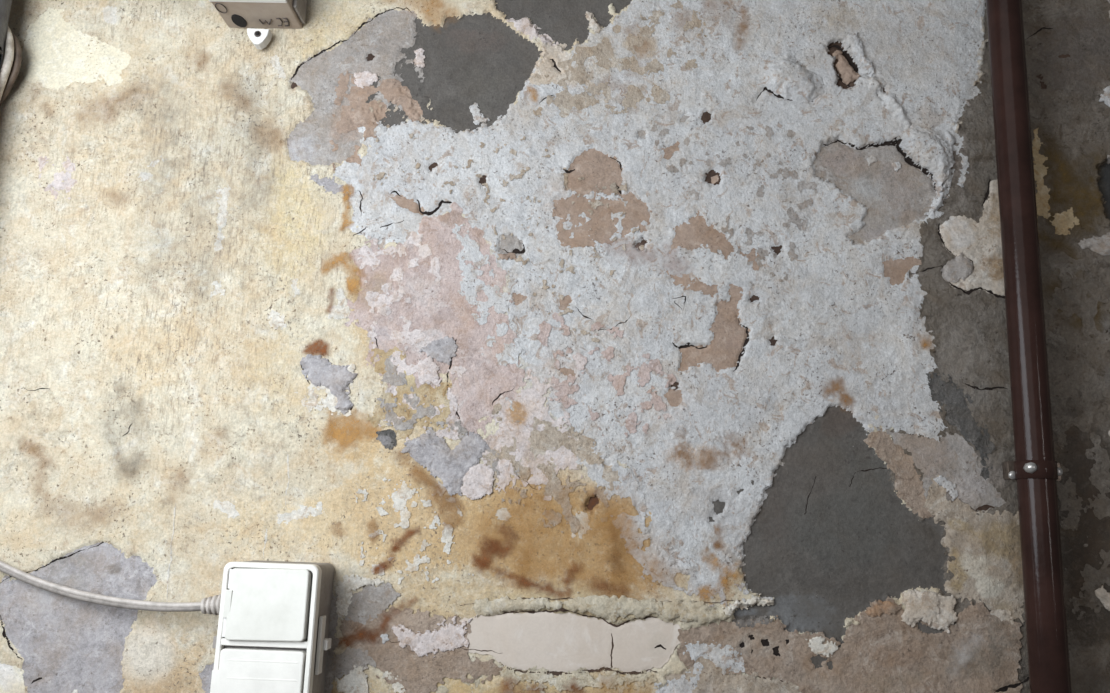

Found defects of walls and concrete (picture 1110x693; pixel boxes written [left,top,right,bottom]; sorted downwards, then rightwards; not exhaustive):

crack [823,136,936,191]
crack [353,191,452,236]
peeling [263,0,1030,693]
peeling [1022,0,1110,693]
corrosion [329,417,378,447]
corrosion [373,530,416,573]
corrosion [475,540,509,568]
corrosion [509,566,577,596]
peeling [0,542,158,693]
peeling [199,663,214,693]